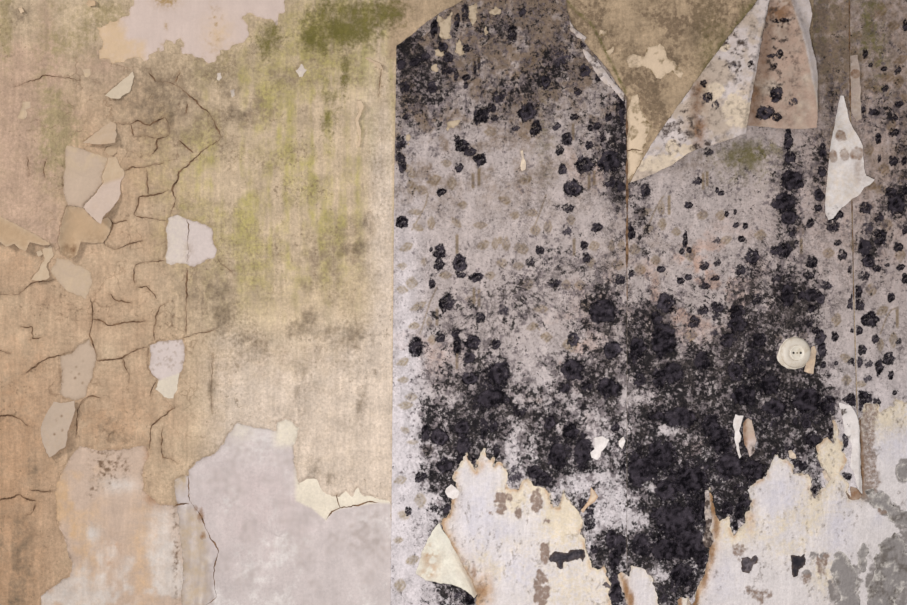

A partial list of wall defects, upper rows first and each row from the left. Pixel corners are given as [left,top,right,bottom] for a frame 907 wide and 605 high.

peeling [97,0,285,64]
water stain [512,75,626,213]
crack [89,73,220,396]
water stain [688,86,907,451]
crack [0,490,48,511]
crack [24,326,61,373]
peeling [40,339,391,605]
crack [326,495,377,520]
water stain [408,327,534,474]
peeling [442,448,659,605]
water stain [590,407,822,605]
peeling [677,400,907,605]